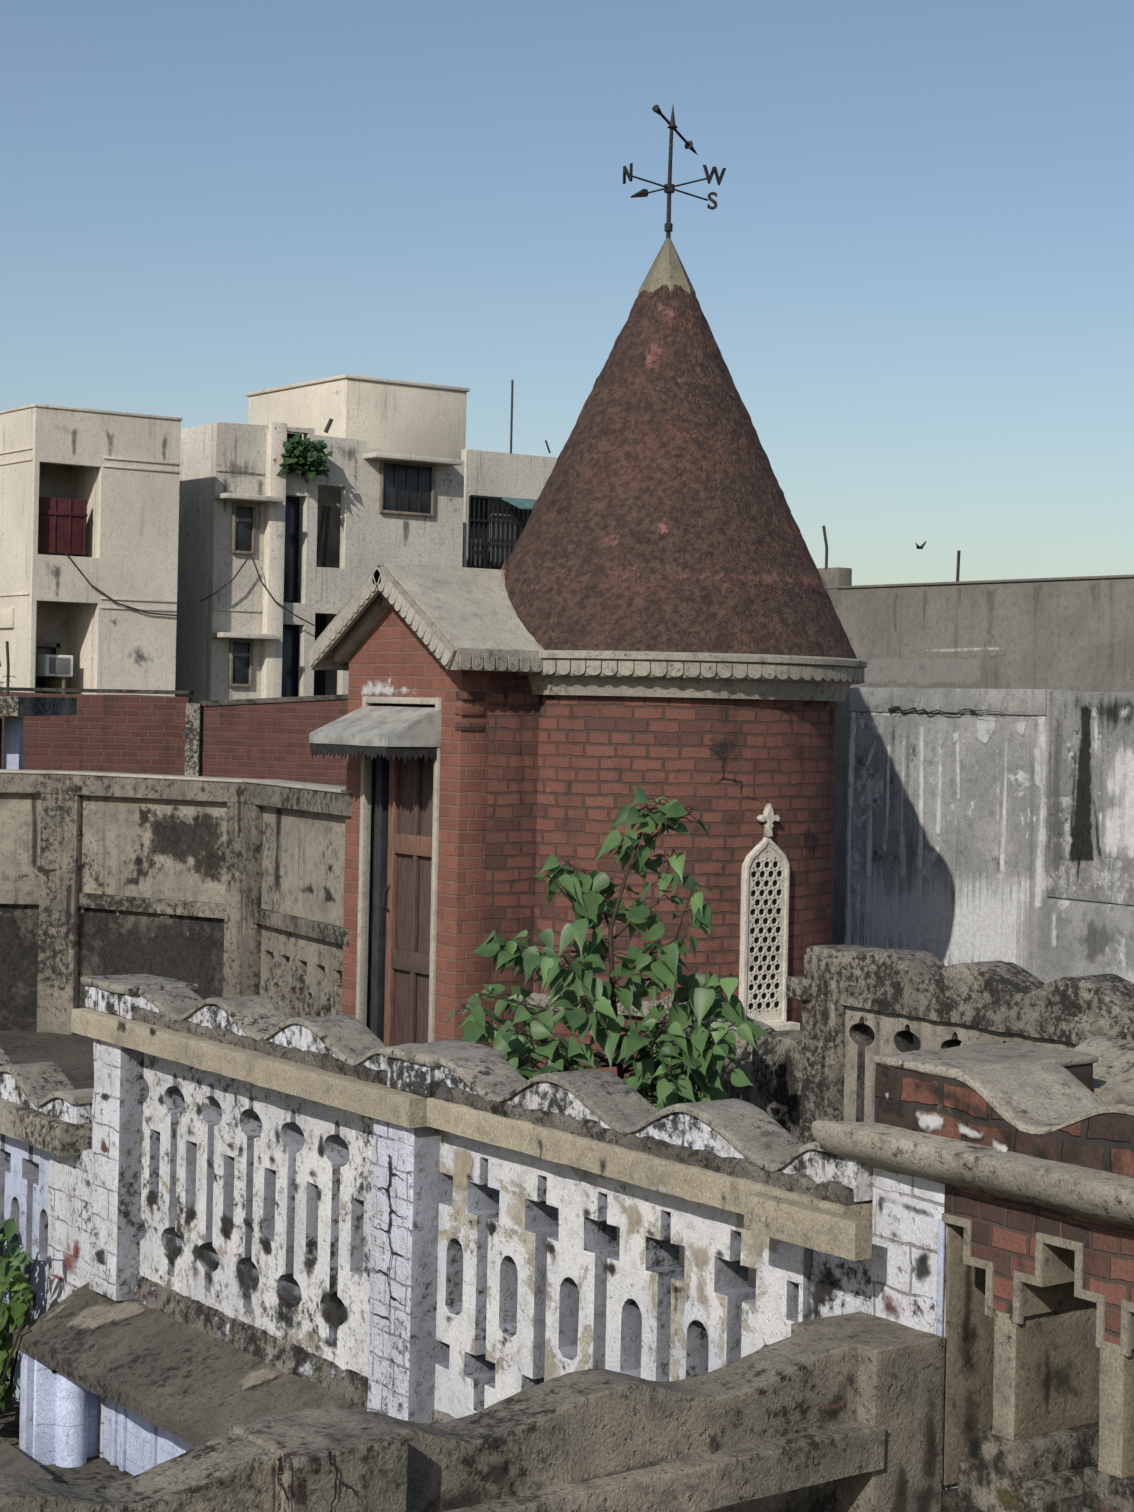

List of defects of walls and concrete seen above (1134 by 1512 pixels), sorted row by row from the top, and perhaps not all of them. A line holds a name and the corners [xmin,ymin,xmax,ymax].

damp [124,788,244,885]
damp [854,727,1057,967]
damp [1053,699,1133,880]
crack [369,1155,406,1338]
crack [277,1456,289,1512]
crack [328,1451,360,1512]